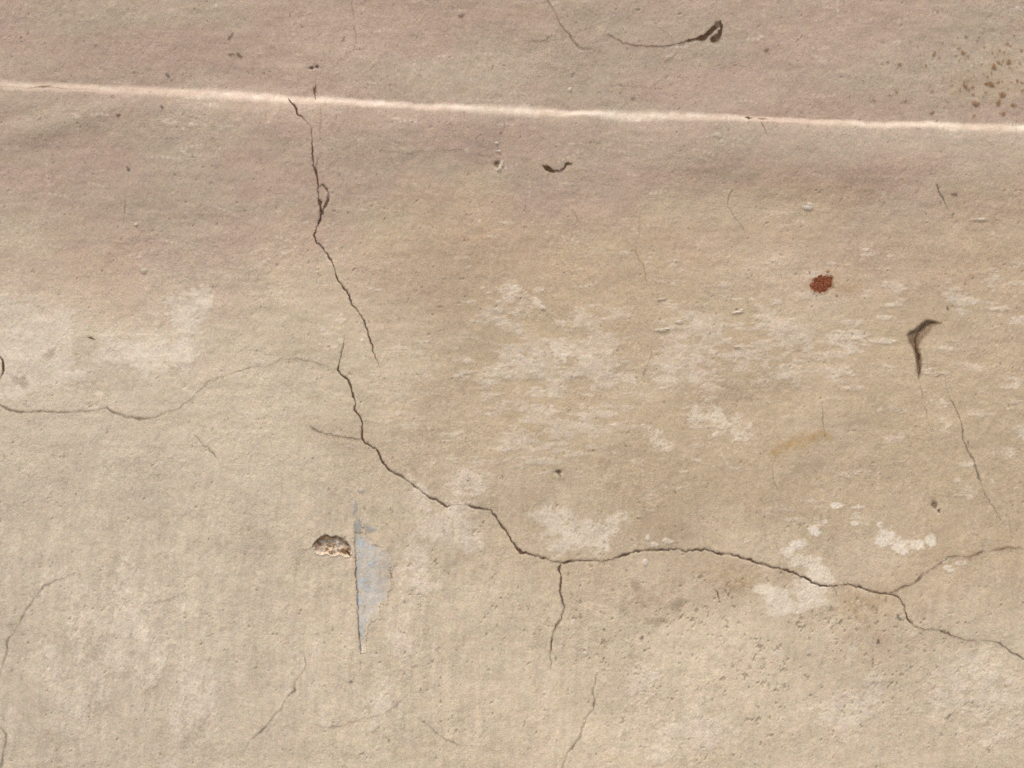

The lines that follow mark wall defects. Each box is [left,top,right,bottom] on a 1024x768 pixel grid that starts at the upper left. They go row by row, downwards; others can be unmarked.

crack [288,84,378,362]
crack [542,162,572,172]
crack [608,20,723,47]
corrosion [808,270,838,296]
peeling [313,464,676,739]
crack [312,344,962,662]